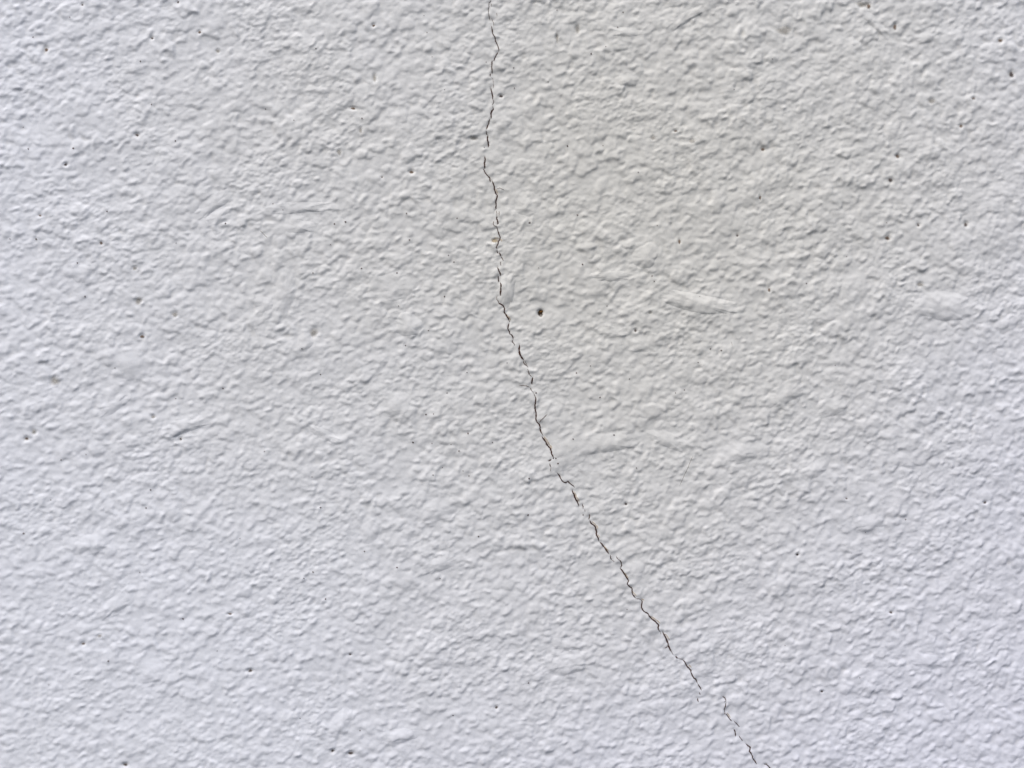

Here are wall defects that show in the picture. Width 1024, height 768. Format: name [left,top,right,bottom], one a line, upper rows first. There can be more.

crack [483,1,770,768]